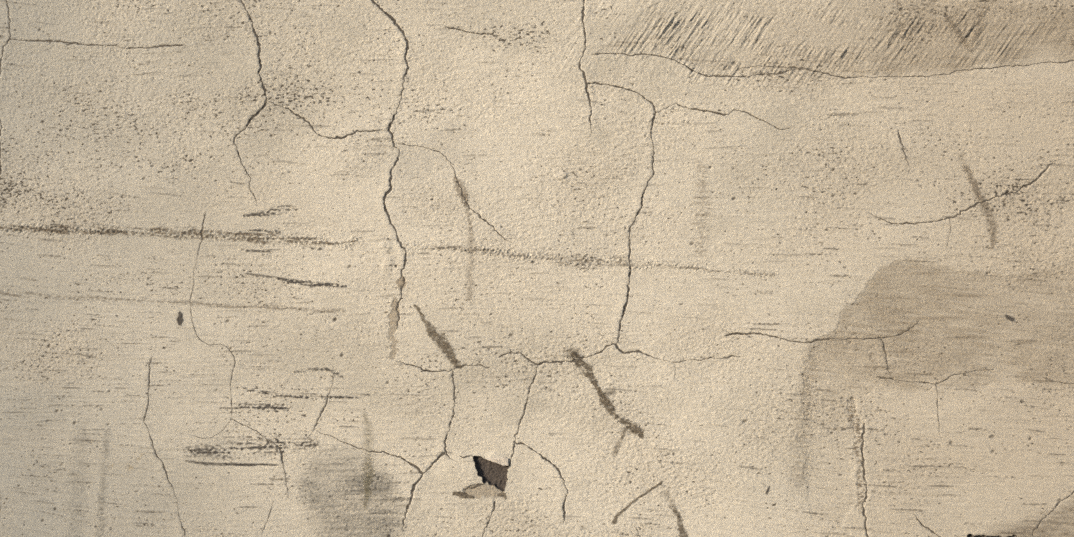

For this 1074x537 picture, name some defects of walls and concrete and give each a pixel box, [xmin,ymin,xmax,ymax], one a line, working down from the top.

crack [0,1,184,74]
crack [143,357,185,535]
crack [190,215,288,535]
crack [233,0,505,329]
spalling [452,455,509,499]
crack [310,0,1074,537]